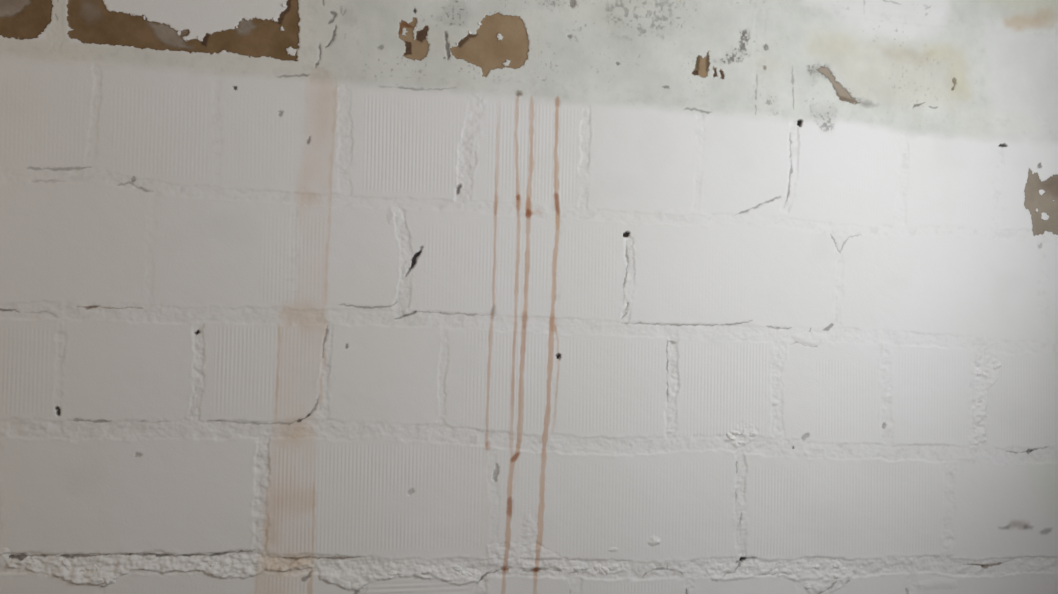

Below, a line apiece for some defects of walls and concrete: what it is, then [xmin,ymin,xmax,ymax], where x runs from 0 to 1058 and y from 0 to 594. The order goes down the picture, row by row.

peeling [0,0,53,40]
peeling [67,0,300,61]
peeling [398,17,429,61]
peeling [450,13,529,77]
peeling [692,52,724,79]
peeling [817,66,857,104]
peeling [1024,169,1058,236]
crack [9,553,94,561]
crack [127,549,246,557]